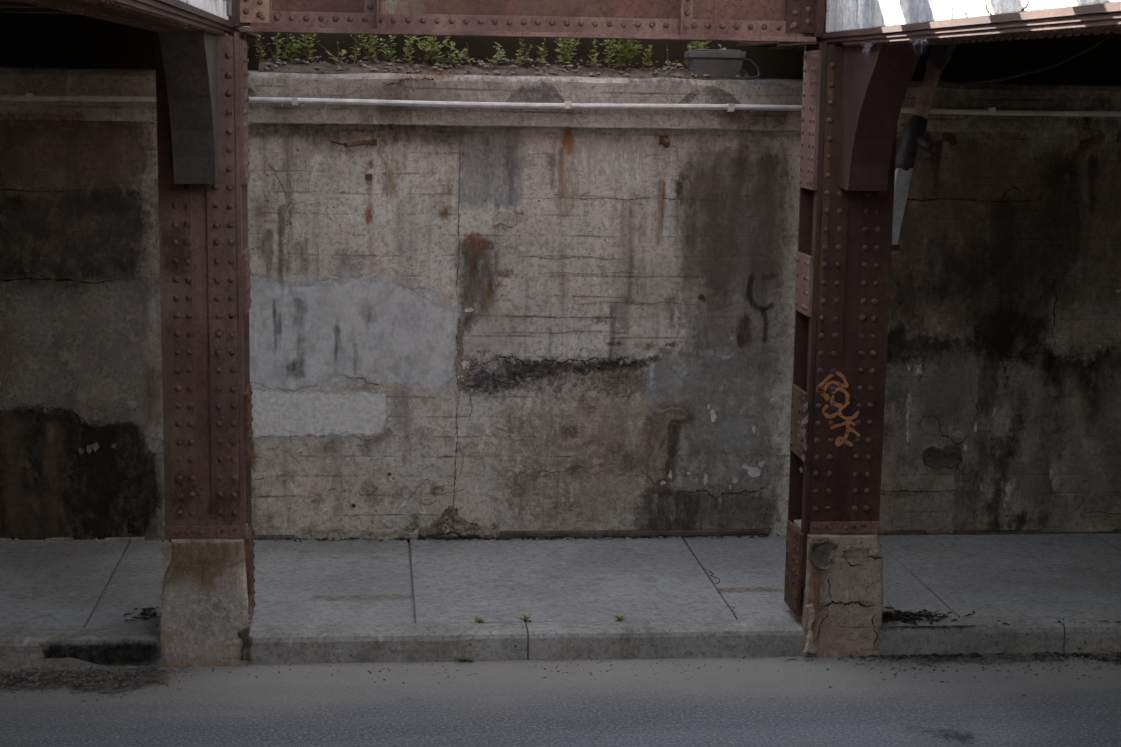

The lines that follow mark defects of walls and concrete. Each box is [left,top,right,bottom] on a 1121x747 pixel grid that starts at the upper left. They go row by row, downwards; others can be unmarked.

crack [380,77,460,91]
damp [249,207,459,392]
corrosion [461,234,493,273]
crack [250,107,772,530]
damp [886,308,1121,422]
damp [0,407,160,540]
damp [987,420,1026,531]
spalling [808,538,838,569]
damp [43,588,251,666]
spalling [803,604,817,653]